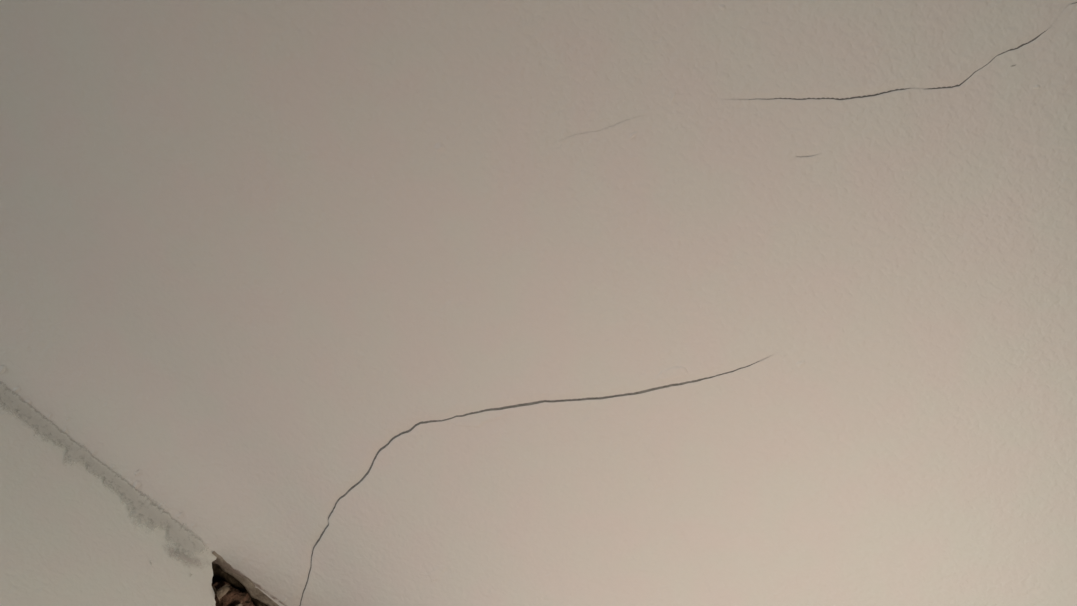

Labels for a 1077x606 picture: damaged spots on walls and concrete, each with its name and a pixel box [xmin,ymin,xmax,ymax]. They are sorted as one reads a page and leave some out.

crack [715,2,1077,111]
crack [0,366,209,556]
crack [300,351,786,606]
flaking render [212,551,279,606]